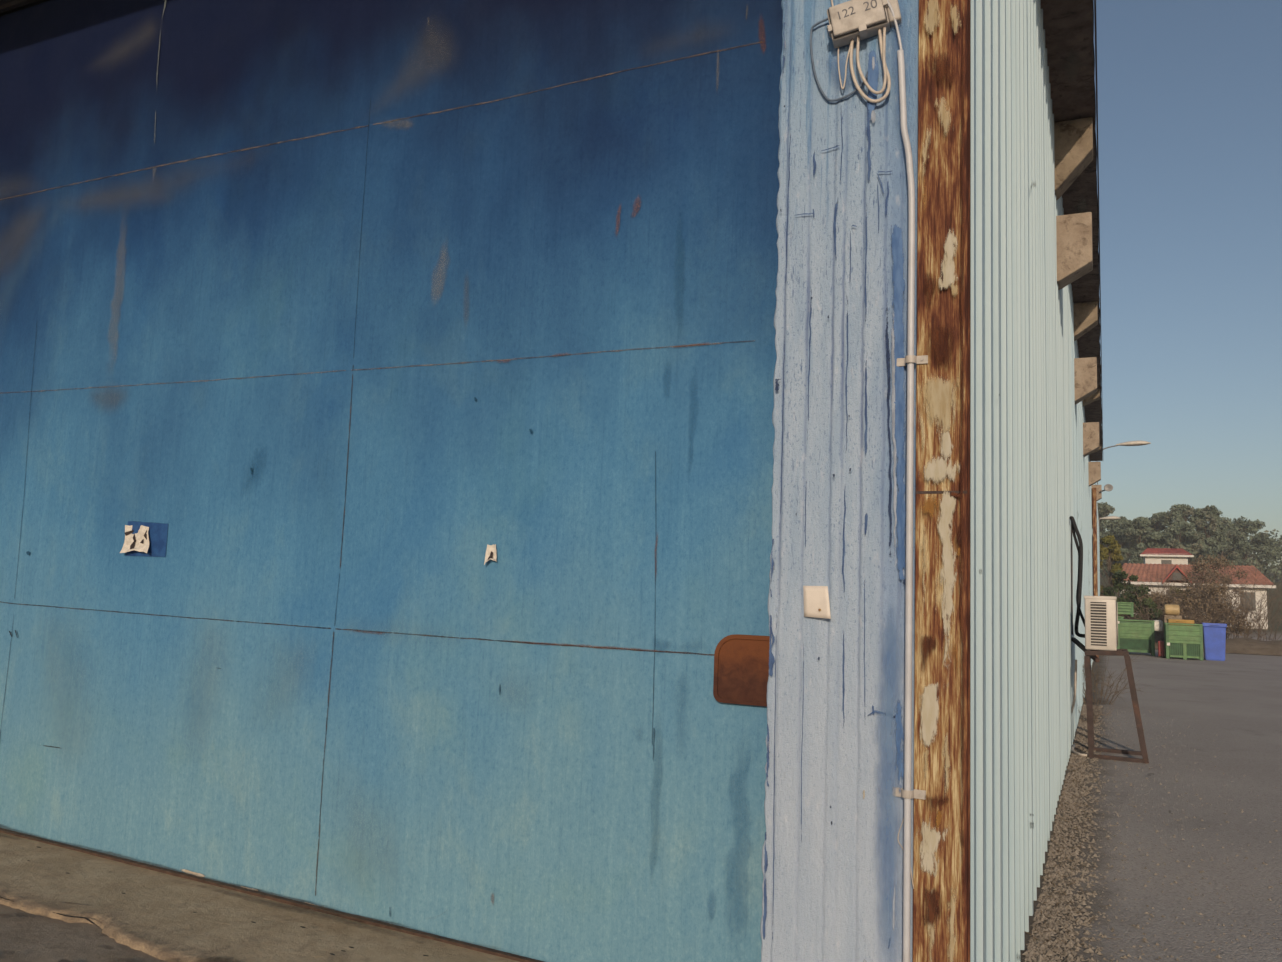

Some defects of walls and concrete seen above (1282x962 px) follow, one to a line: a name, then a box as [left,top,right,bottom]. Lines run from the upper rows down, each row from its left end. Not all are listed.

peeling [925,0,961,34]
peeling [923,98,951,176]
rust [921,19,965,862]
water stain [883,641,904,926]
rust [923,889,941,926]